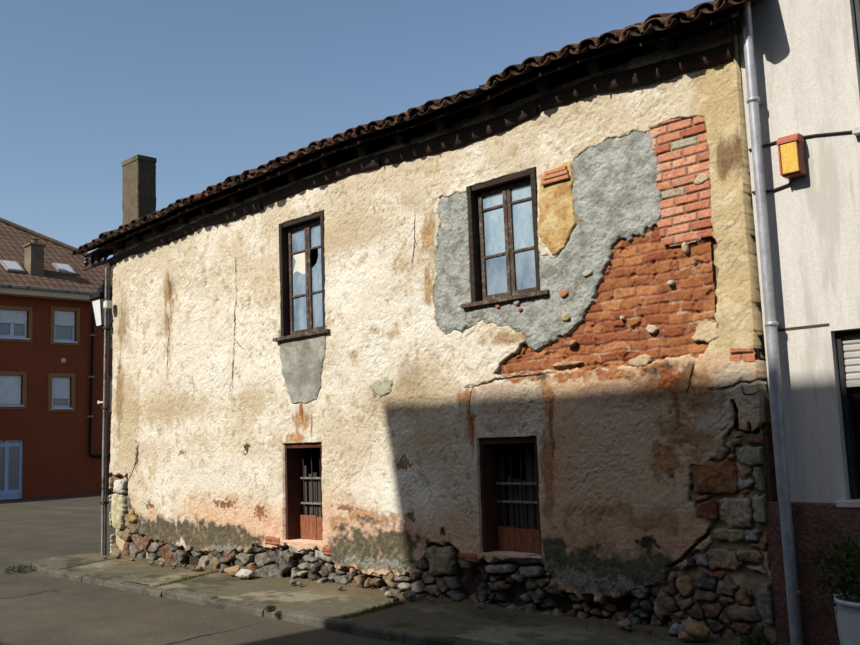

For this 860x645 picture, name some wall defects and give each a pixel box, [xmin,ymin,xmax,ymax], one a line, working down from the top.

flaking render [497,116,719,377]
flaking render [730,348,756,362]
rust [457,389,474,448]
rust [507,362,724,535]
damp [330,523,428,575]